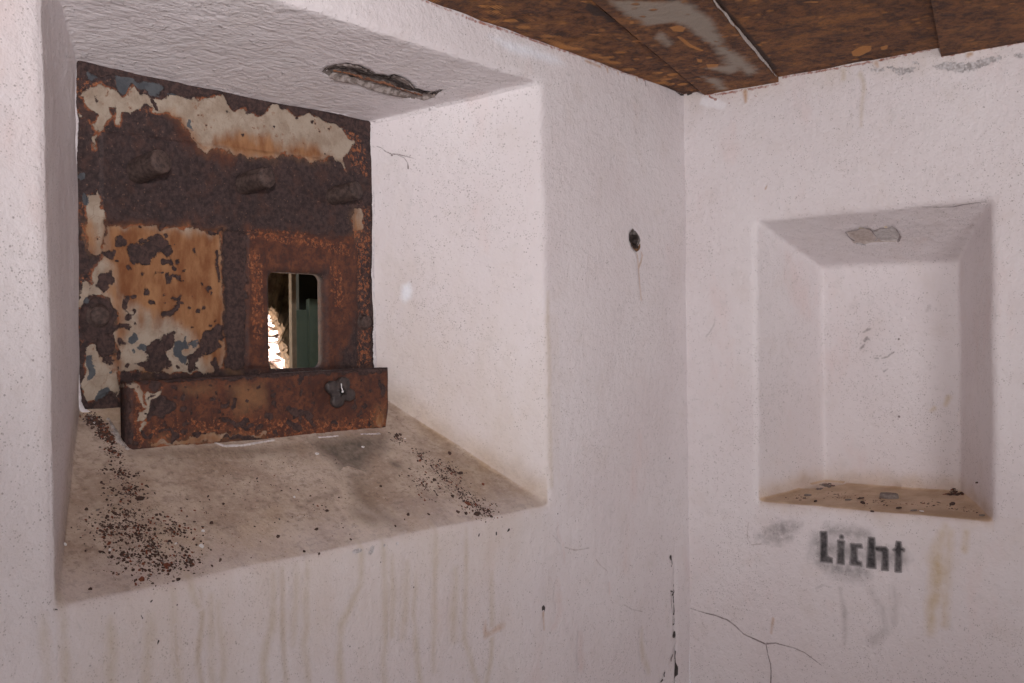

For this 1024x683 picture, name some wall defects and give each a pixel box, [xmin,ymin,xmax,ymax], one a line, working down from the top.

spalling [322,63,442,101]
water stain [123,430,506,683]
crack [660,555,821,683]